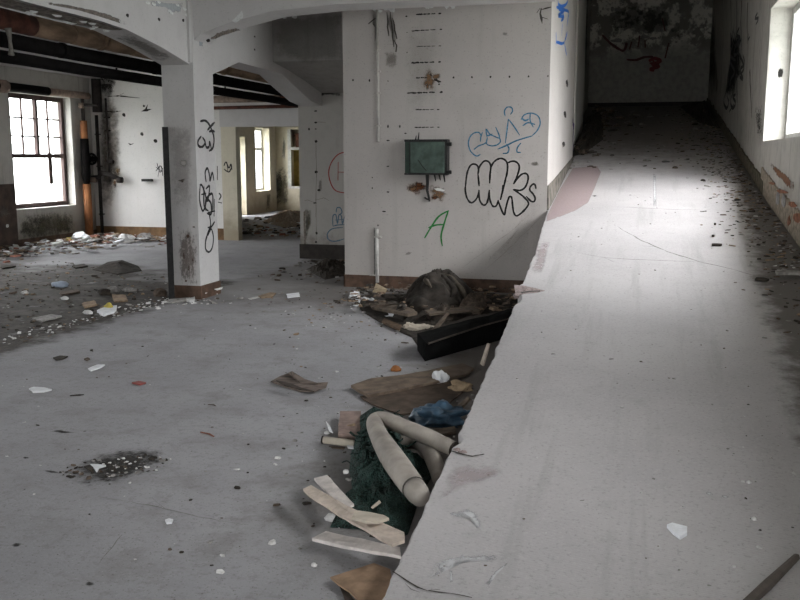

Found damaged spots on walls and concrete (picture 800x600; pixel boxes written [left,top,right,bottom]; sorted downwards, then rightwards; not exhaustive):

leakage [21,213,72,238]
flaking render [761,165,800,247]